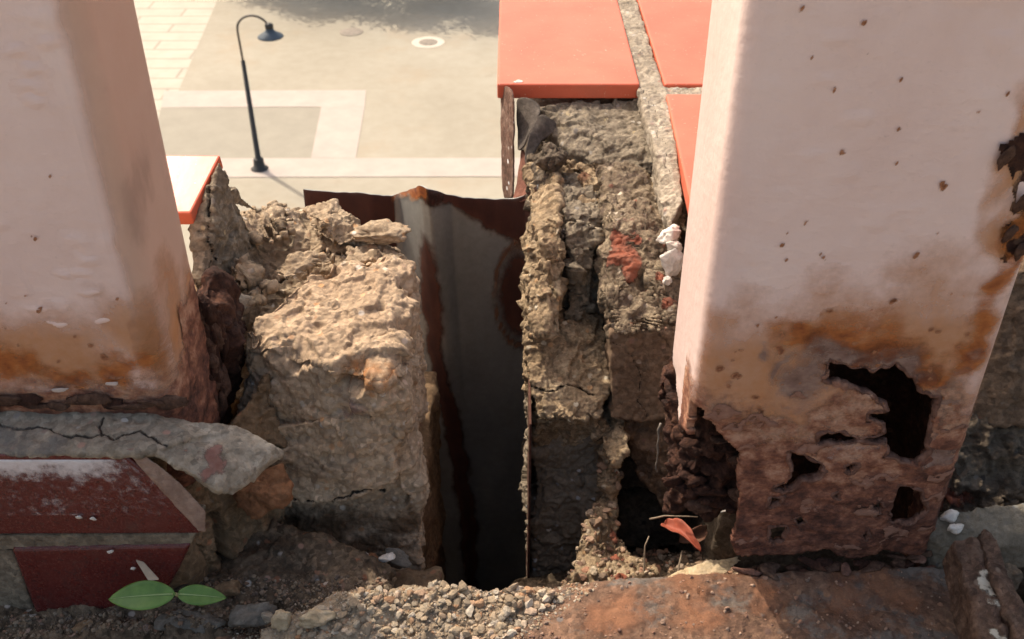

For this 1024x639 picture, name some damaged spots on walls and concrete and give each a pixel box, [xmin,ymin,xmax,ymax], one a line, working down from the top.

corrosion [0,0,247,425]
corrosion [303,185,537,349]
corrosion [985,164,1021,204]
peeling [997,133,1024,263]
corrosion [1015,105,1024,136]
crack [0,417,168,447]
corrosion [167,463,196,487]
corrosion [658,216,1024,580]